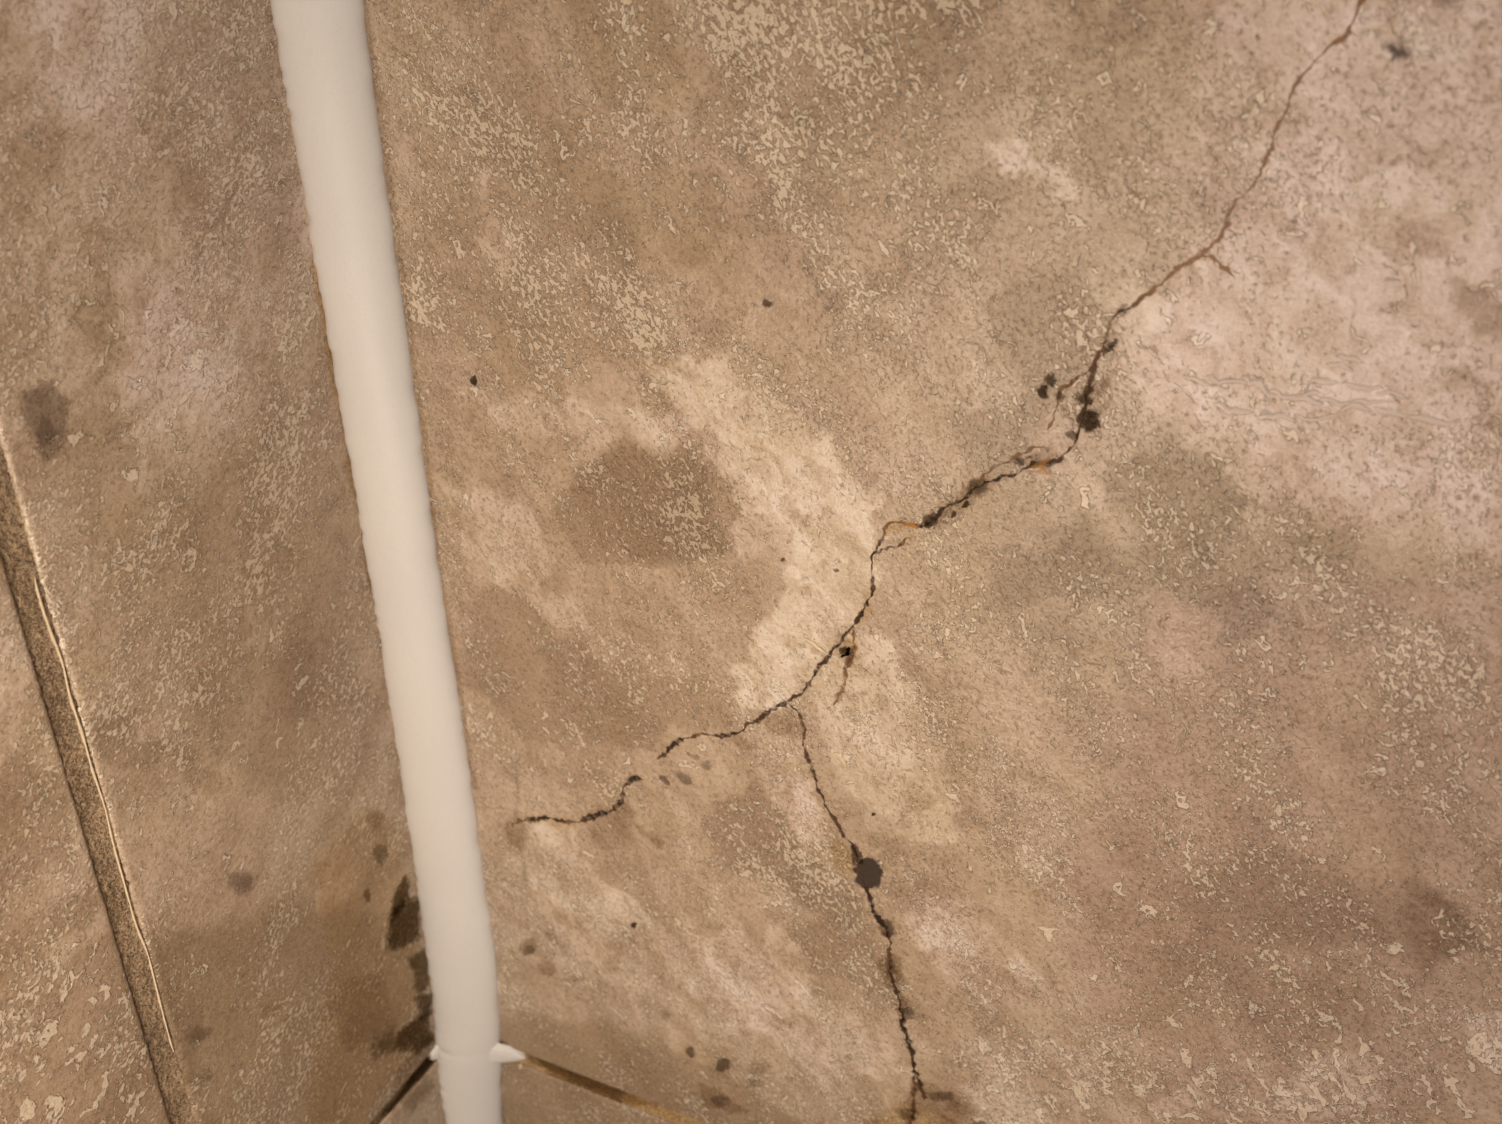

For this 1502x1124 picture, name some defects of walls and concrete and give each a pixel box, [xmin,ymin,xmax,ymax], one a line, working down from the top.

crack [512,0,1366,1124]
water stain [387,878,420,951]
water stain [383,995,436,1115]